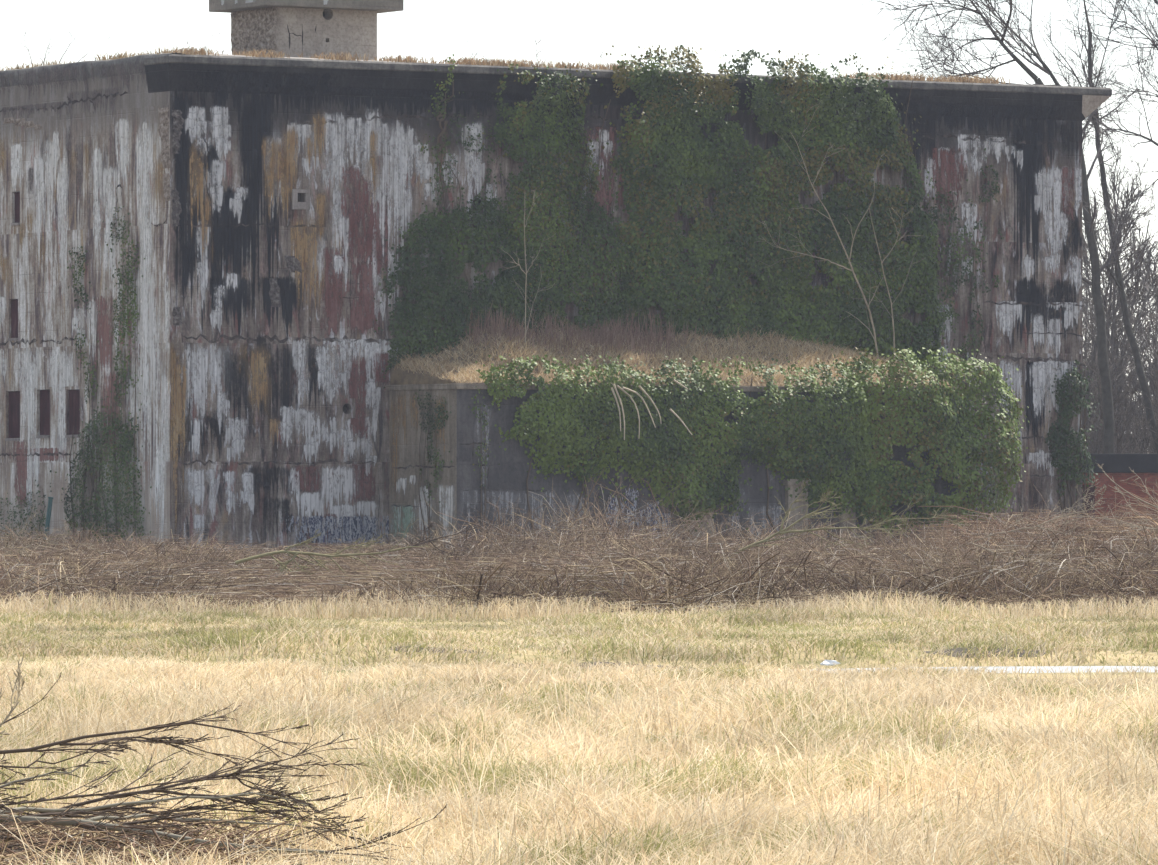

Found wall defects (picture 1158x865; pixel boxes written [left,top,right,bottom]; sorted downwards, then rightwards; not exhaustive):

spalling [158,107,185,226]
spalling [172,307,182,325]
water stain [0,61,623,548]
peeling [319,167,388,336]
peeling [932,148,965,211]
peeling [1061,167,1075,220]